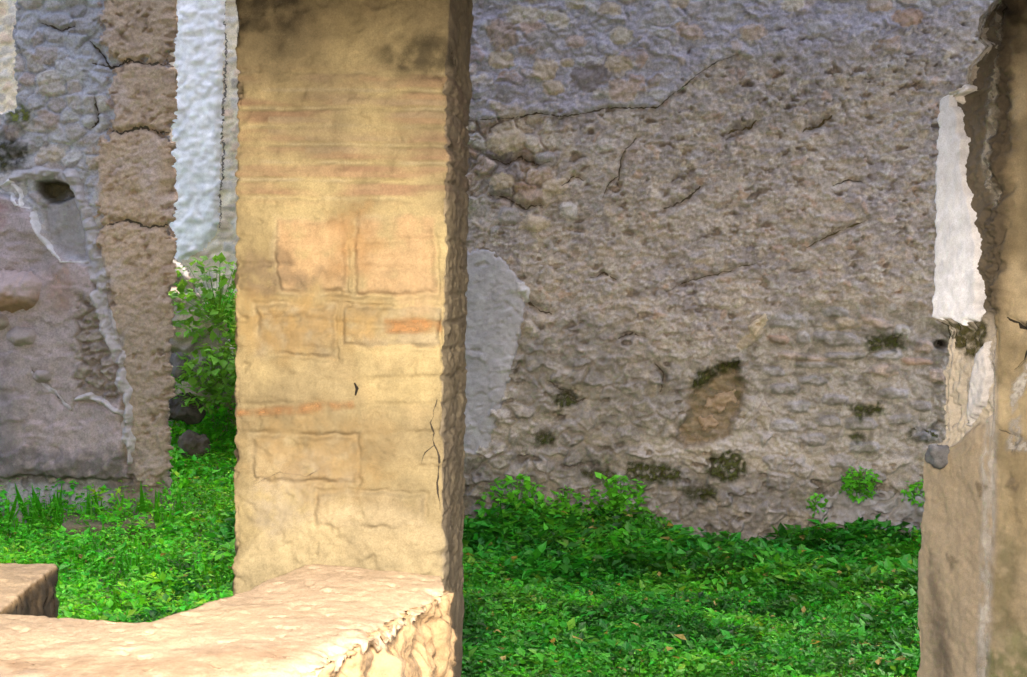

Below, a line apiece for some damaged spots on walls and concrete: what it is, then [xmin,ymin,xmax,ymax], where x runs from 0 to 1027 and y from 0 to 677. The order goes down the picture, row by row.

crack [42,23,170,69]
crack [476,55,735,122]
crack [491,156,550,166]
crack [561,138,636,197]
crack [490,195,541,210]
crack [664,186,701,209]
peeling [932,84,987,326]
crack [667,261,761,292]
peeling [0,165,136,464]
spalling [676,367,773,445]
crack [421,399,441,502]